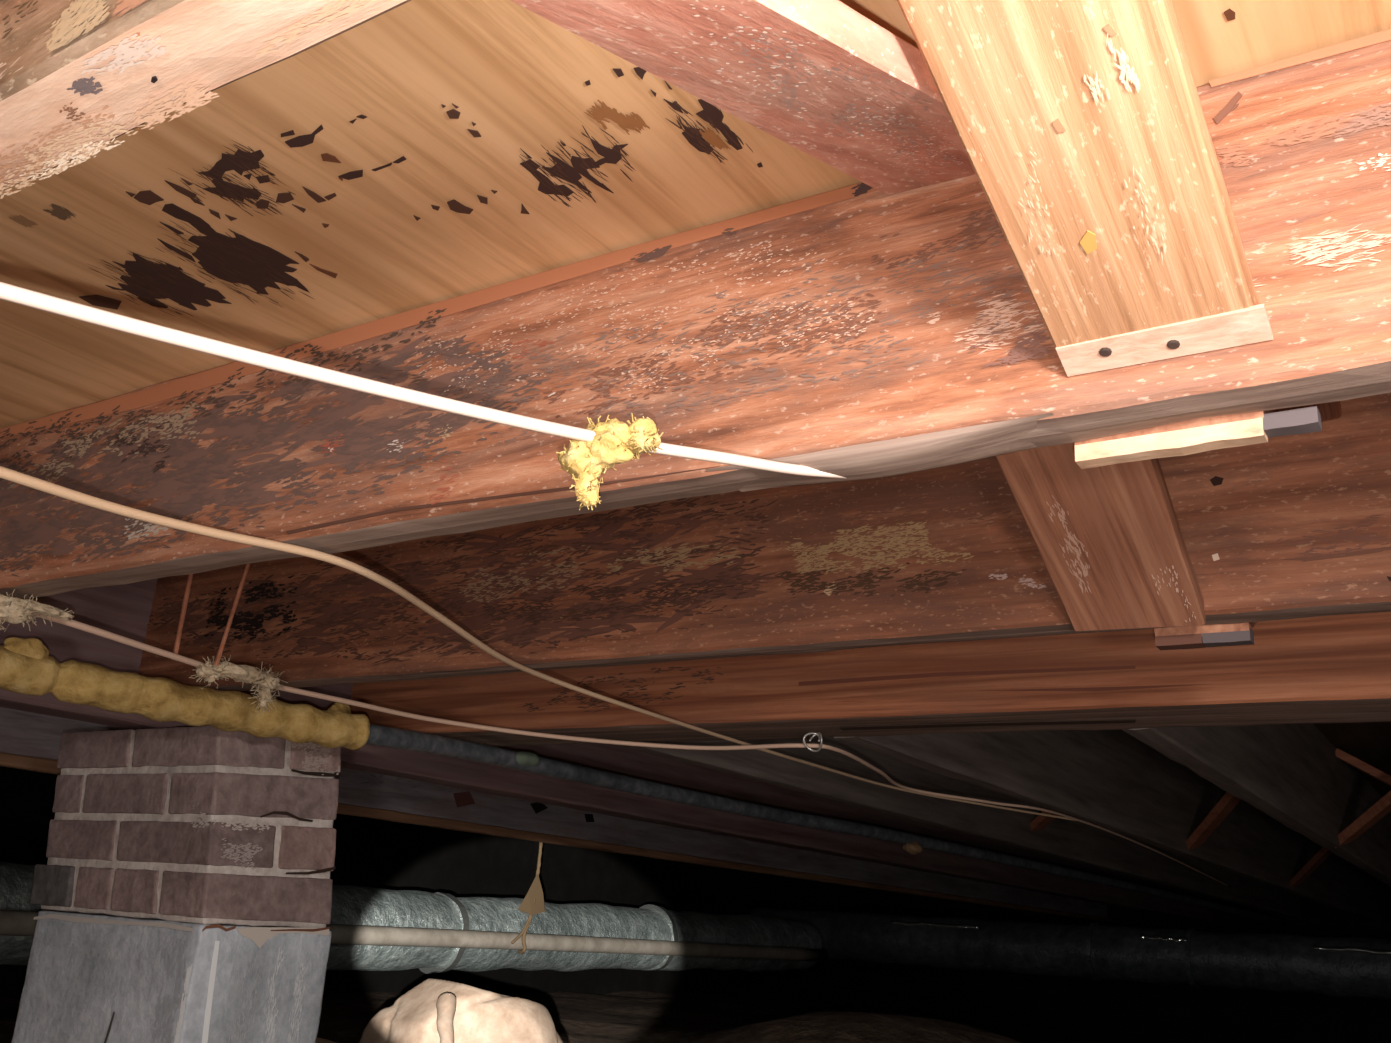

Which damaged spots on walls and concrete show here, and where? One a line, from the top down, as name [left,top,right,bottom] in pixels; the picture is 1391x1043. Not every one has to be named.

mould [46,0,148,54]
mould [81,34,167,75]
mould [0,106,115,192]
damp [441,103,481,137]
damp [519,80,650,207]
damp [613,67,763,168]
damp [9,203,77,228]
damp [79,124,406,317]
damp [413,190,497,221]
damp [0,209,1053,577]
damp [147,475,1021,666]
crack [104,1012,115,1043]